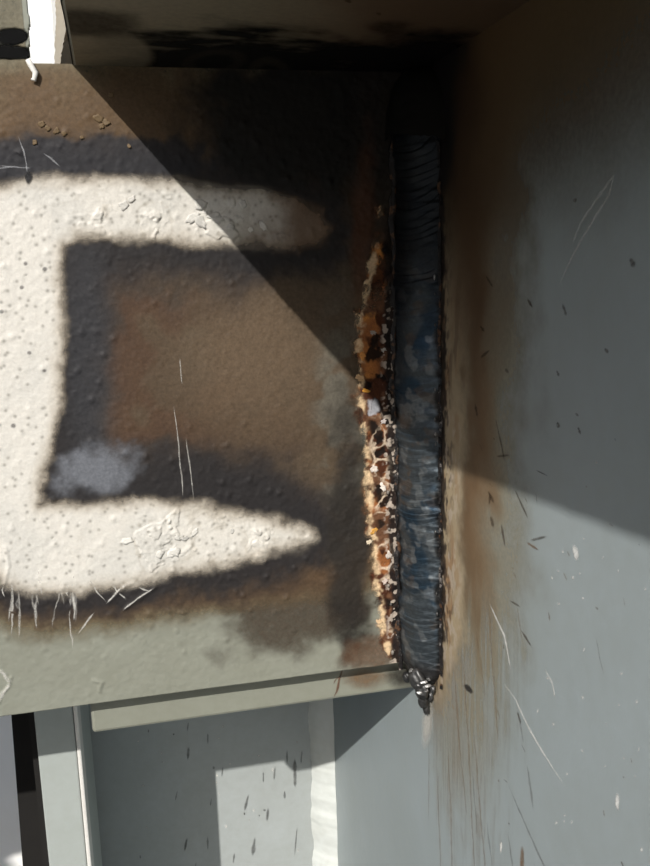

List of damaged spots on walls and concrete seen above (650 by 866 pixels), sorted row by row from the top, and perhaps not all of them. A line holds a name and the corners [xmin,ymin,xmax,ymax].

rust [352,232,400,663]